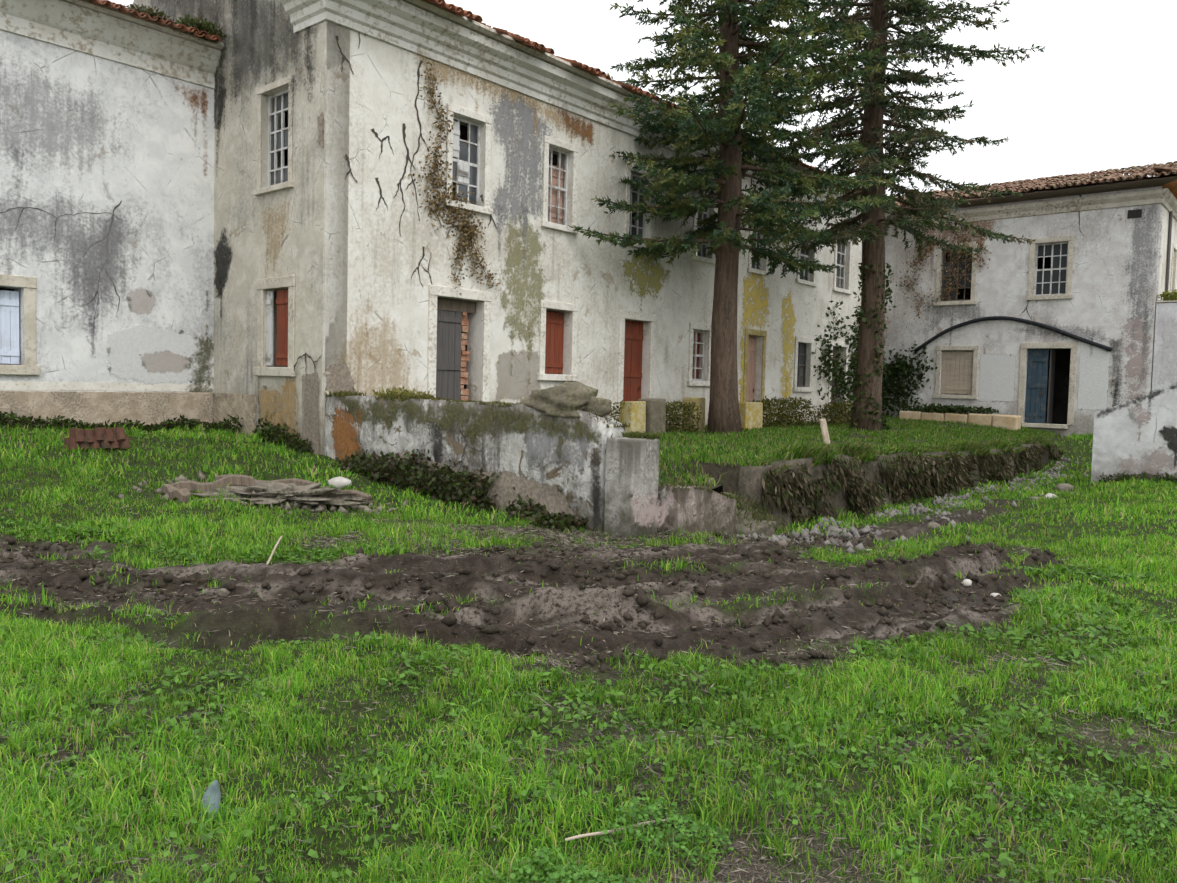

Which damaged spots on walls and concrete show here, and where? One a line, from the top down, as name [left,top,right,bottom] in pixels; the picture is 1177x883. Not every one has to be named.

water stain [150,0,316,163]
water stain [0,198,122,305]
water stain [206,228,233,316]
water stain [1027,206,1161,407]
peeling [106,323,206,385]
water stain [189,325,214,393]
spalling [242,363,357,454]